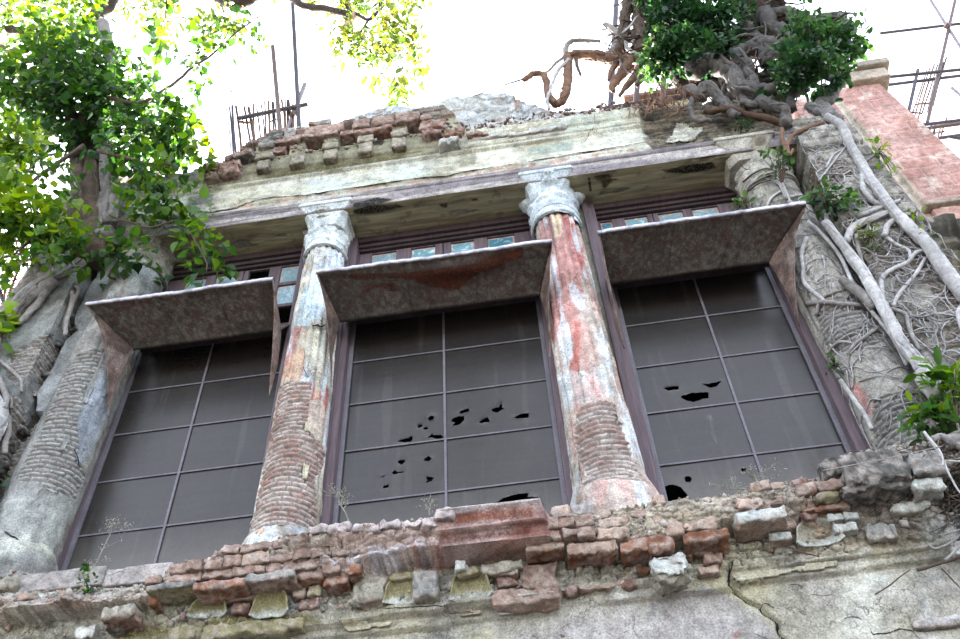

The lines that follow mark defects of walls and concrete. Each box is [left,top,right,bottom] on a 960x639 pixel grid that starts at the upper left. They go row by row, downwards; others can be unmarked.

spalling [248,381,326,535]
spalling [573,401,645,489]
crack [727,561,788,639]
peeling [733,560,838,585]
crack [844,616,920,639]